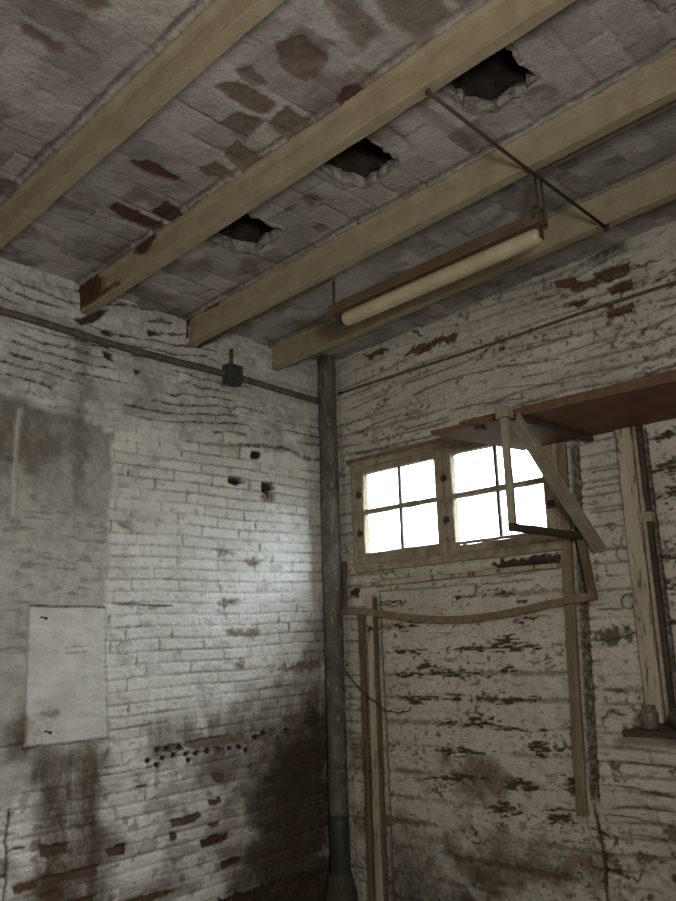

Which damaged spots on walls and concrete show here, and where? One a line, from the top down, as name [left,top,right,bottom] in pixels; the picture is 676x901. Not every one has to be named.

spalling [451,47,530,100]
spalling [326,137,392,178]
spalling [219,213,274,243]
peeling [554,262,634,319]
water stain [10,409,23,517]
spalling [492,552,561,568]
spalling [446,634,542,653]
spalling [435,714,564,758]
water stain [180,683,330,901]
crack [0,809,25,899]
water stain [33,752,103,901]
spalling [169,812,228,848]